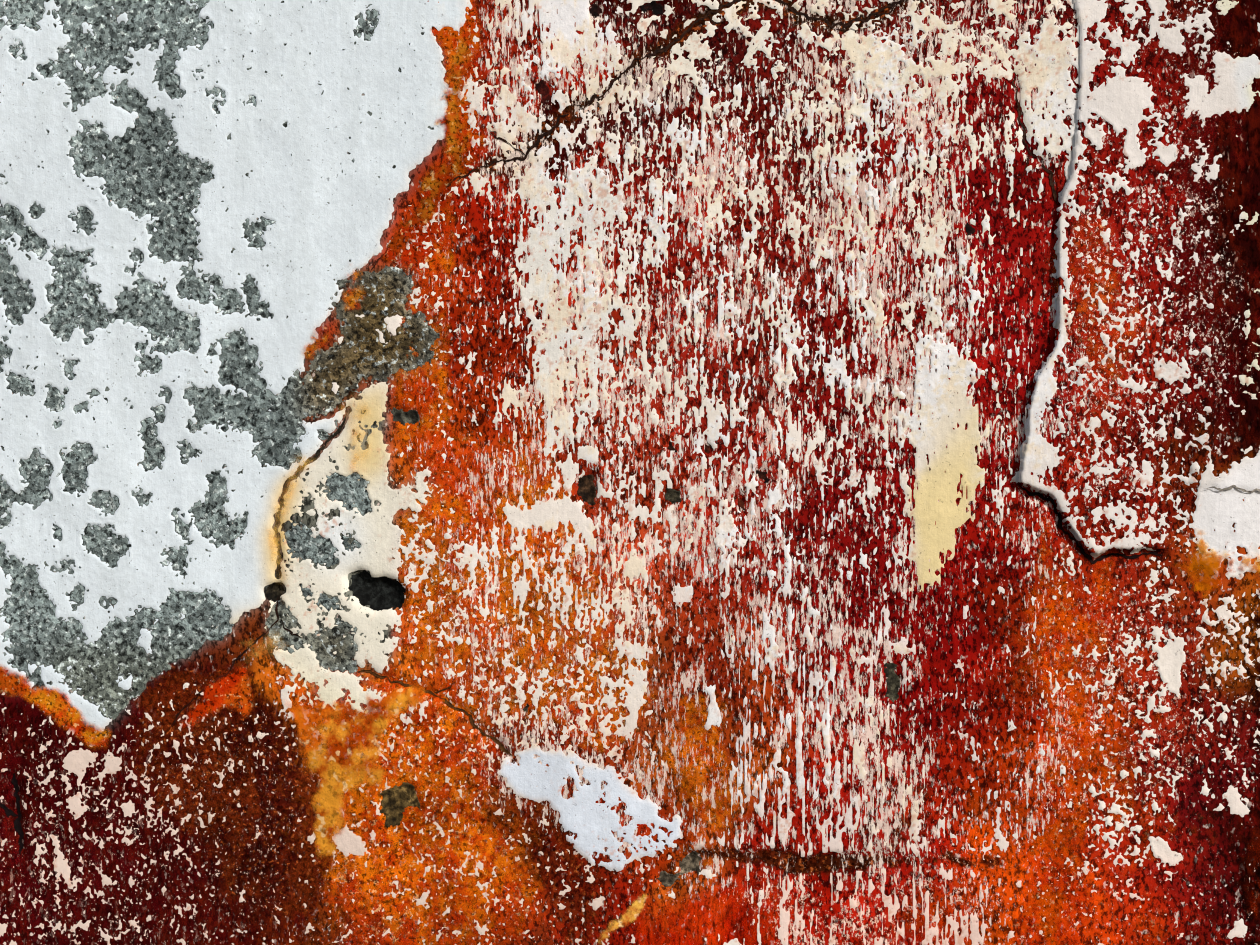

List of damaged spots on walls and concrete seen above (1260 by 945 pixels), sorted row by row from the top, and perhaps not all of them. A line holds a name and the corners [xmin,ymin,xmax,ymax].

crack [777,0,904,32]
crack [371,0,741,270]
crack [1012,72,1058,205]
corrosion [1075,217,1127,374]
corrosion [293,0,650,945]
crack [1017,483,1164,564]
corrosion [0,666,109,746]
corrosion [188,670,252,724]
peeling [0,699,272,945]
peeling [229,779,320,862]
peeling [326,789,394,872]
peeling [1156,885,1253,942]